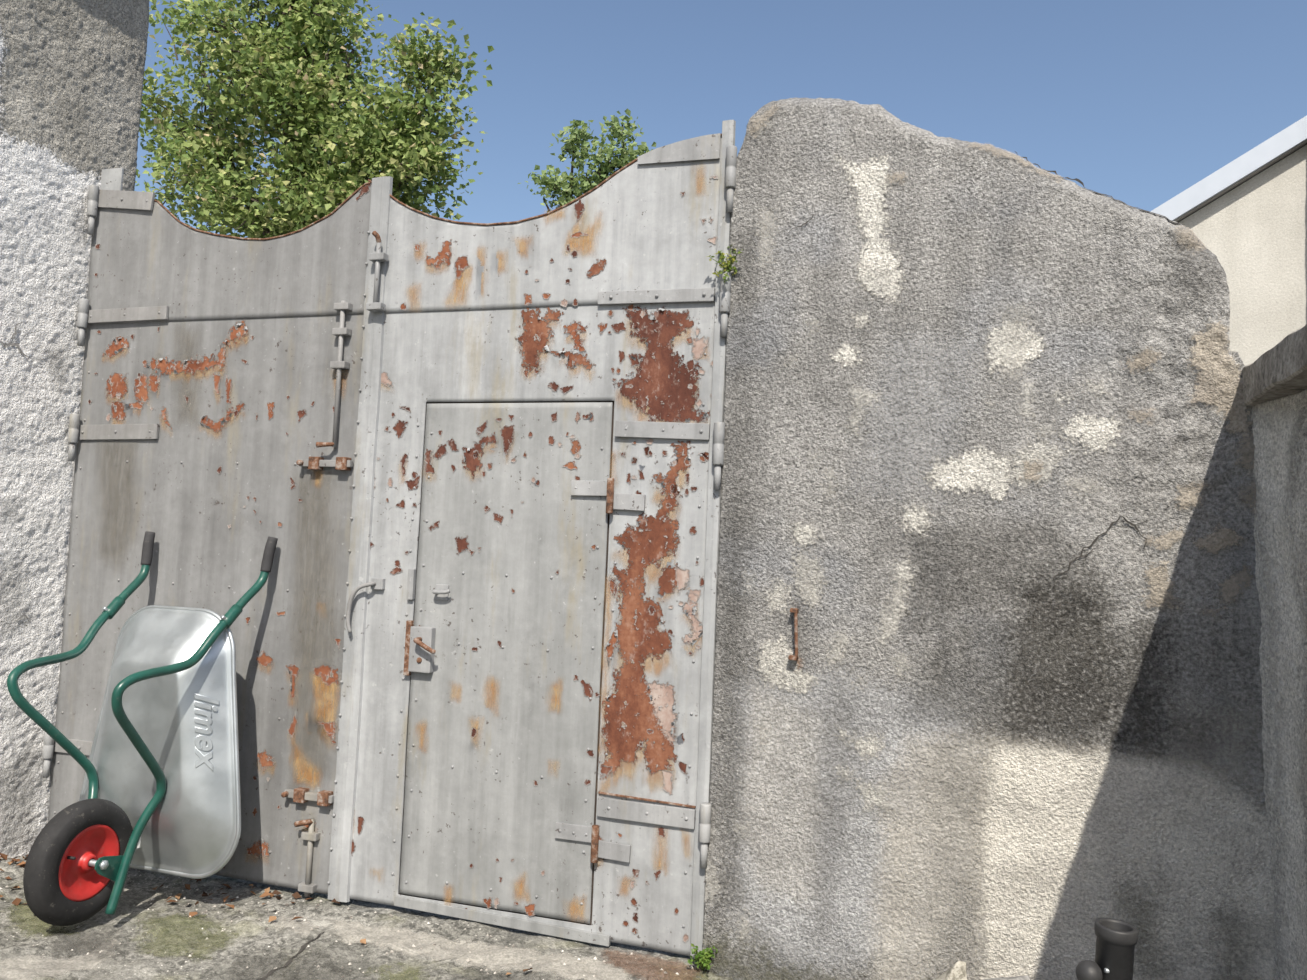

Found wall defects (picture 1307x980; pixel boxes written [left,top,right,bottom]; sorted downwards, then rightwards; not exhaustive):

corrosion [101,319,307,435]
corrosion [393,405,411,438]
corrosion [396,414,516,508]
corrosion [562,438,581,470]
corrosion [515,292,710,423]
crack [1053,515,1148,588]
corrosion [574,440,709,779]
corrosion [256,649,340,746]
leakage [1006,582,1162,748]
corrosion [257,750,276,771]